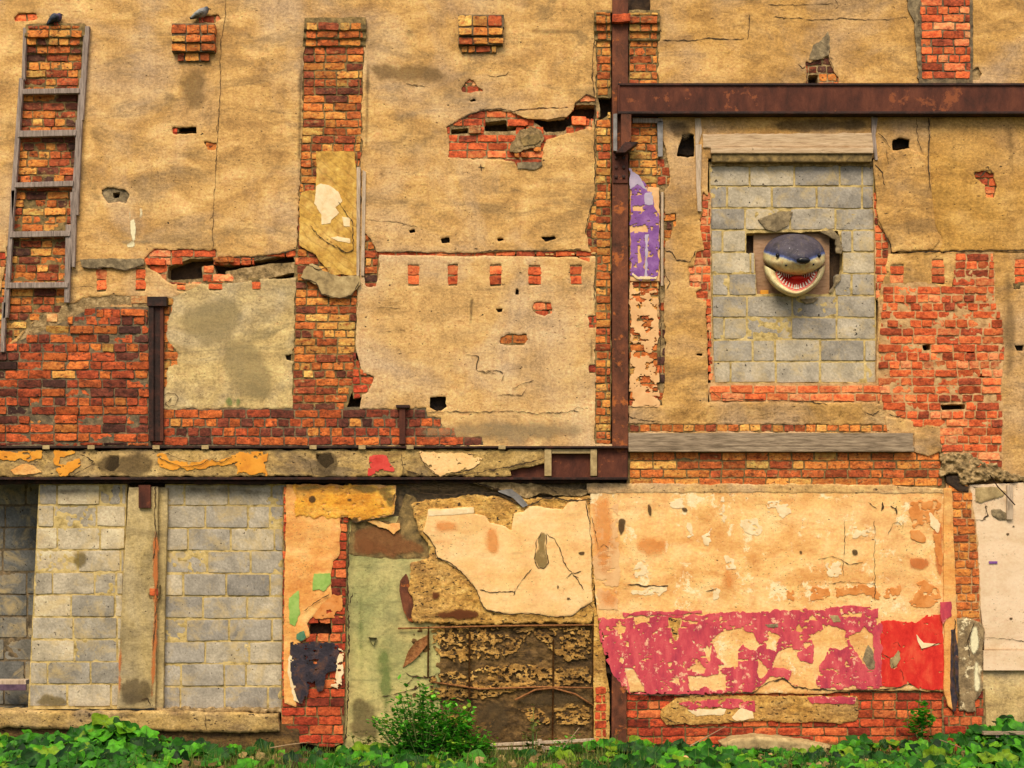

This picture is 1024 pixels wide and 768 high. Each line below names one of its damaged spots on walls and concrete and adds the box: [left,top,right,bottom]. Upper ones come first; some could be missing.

crack [207,0,596,299]
spalling [446,95,600,165]
spalling [13,249,299,389]
crack [414,354,583,415]
peeling [628,143,676,407]
spalling [872,193,1006,467]
peeling [0,450,81,476]
peeling [157,451,268,476]
peeling [287,591,344,704]
peeling [399,574,414,622]
crack [304,451,609,739]
peeling [403,498,985,721]